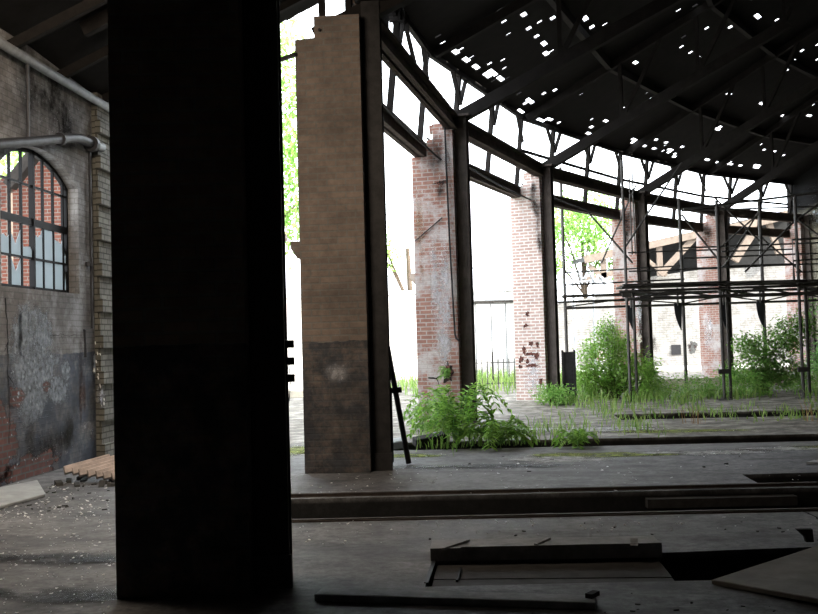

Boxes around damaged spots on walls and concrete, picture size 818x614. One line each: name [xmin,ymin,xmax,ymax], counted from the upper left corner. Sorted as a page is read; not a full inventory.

peeling [0,306,71,485]
hole [518,341,539,369]